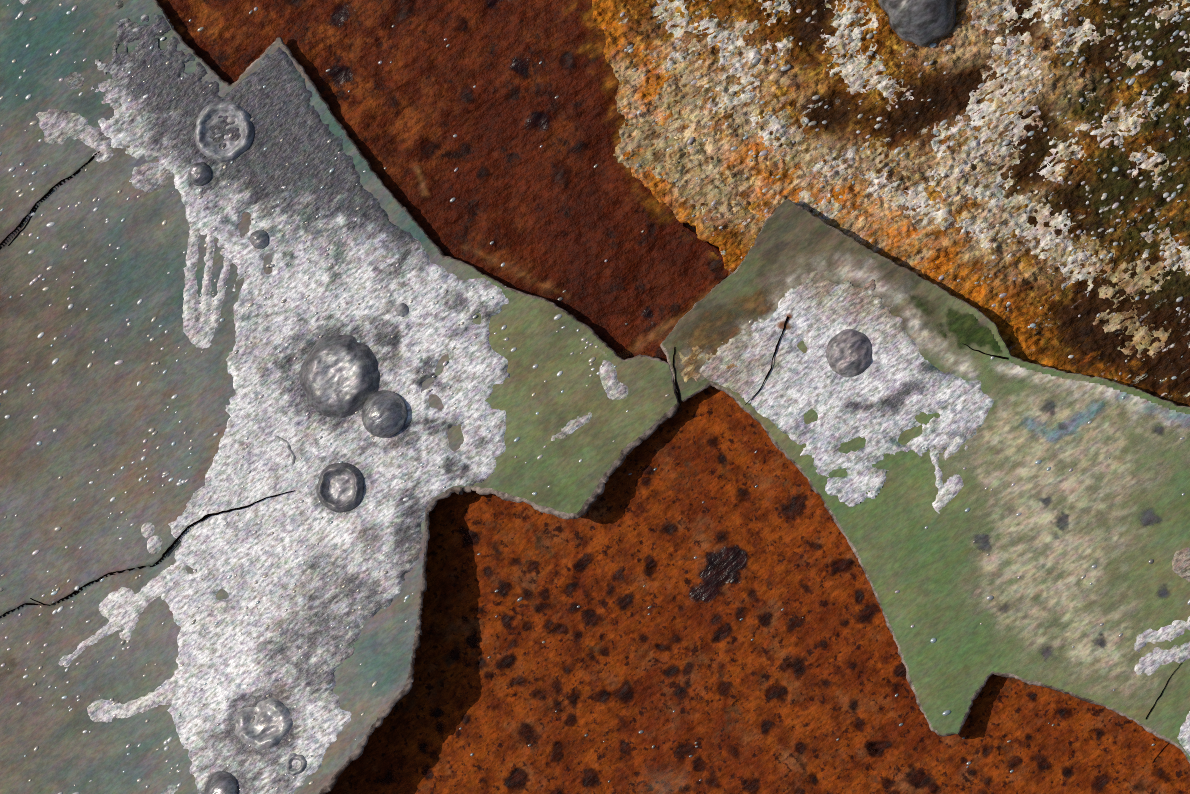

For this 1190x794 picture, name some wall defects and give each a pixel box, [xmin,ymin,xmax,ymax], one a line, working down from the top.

crack [0,151,100,249]
crack [745,316,789,405]
damp [767,258,1190,696]
crack [0,490,295,618]
corrosion [451,554,601,726]
corrosion [678,532,772,642]
corrosion [840,590,880,626]
corrosion [504,768,527,790]
corrosion [594,682,633,704]
corrosion [849,700,892,757]
corrosion [905,767,940,794]
corrosion [1008,754,1073,778]